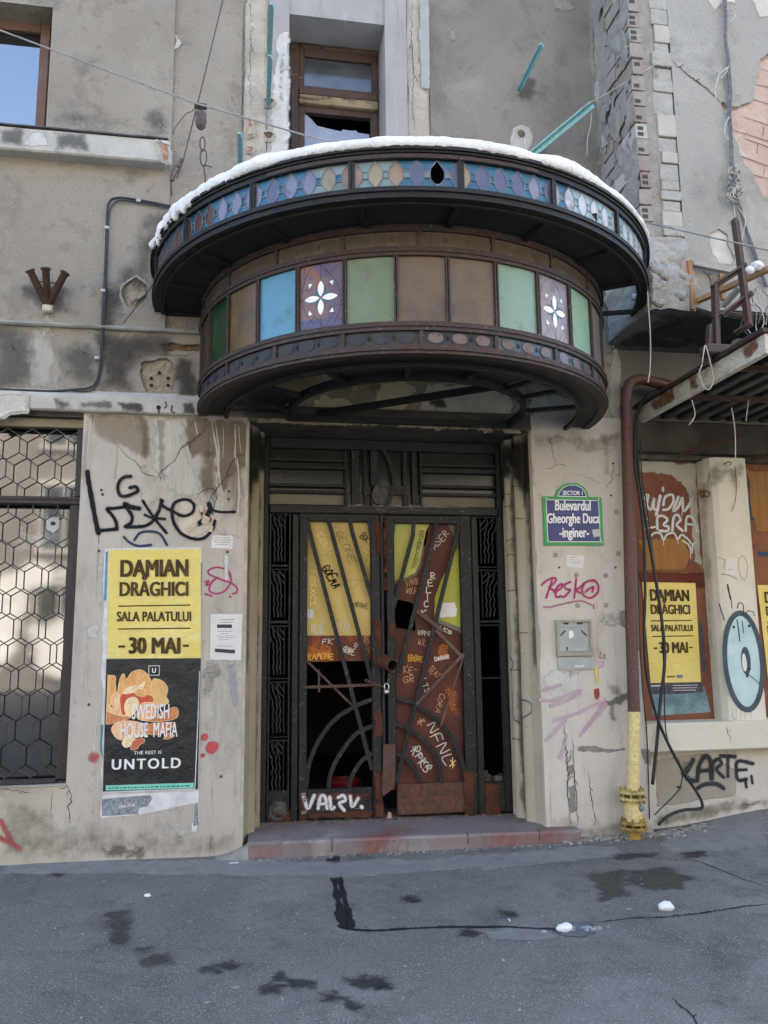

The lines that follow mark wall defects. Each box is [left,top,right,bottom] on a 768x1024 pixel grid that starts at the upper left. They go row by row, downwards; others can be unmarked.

crack [409,15,417,128]
spalling [722,55,768,198]
flaking render [588,0,698,419]
damp [0,330,56,385]
damp [67,317,168,387]
corrosion [652,388,674,409]
corrosion [744,341,758,357]
crack [118,424,242,503]
damp [82,358,260,705]
crack [562,727,596,826]